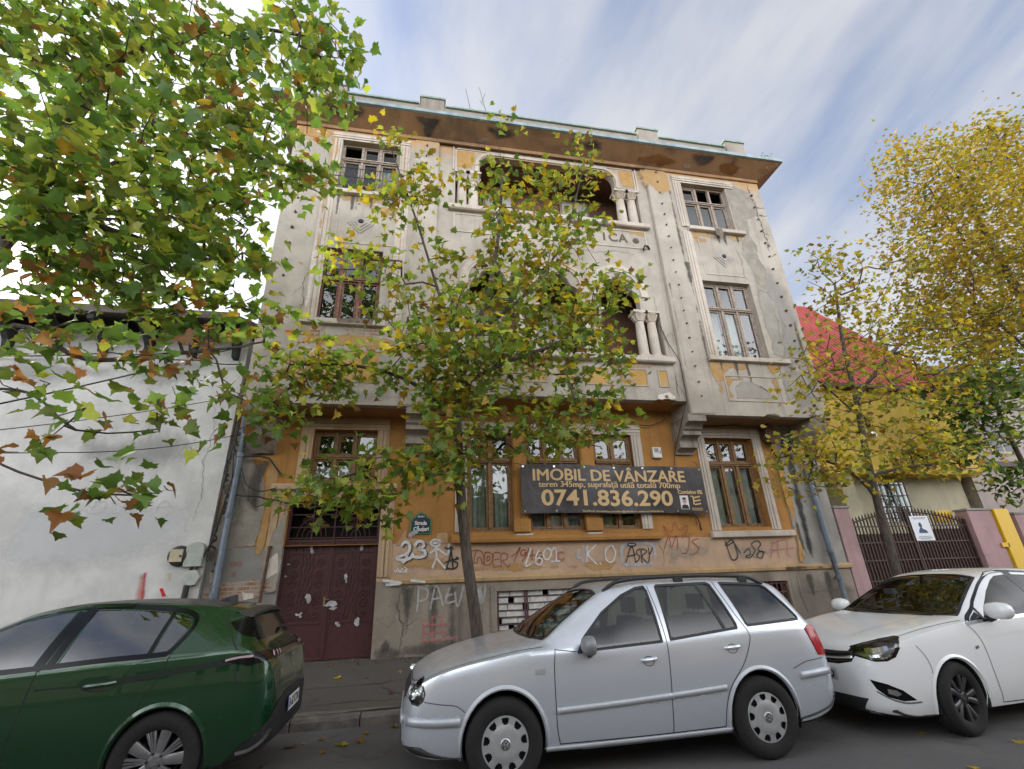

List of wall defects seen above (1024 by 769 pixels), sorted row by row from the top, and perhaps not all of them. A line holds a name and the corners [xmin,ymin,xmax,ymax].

leakage [418,117,438,137]
leakage [684,155,714,168]
peeling [618,170,670,192]
crack [747,187,770,250]
peeling [710,361,747,397]
crack [194,418,241,572]
spalling [203,461,285,601]